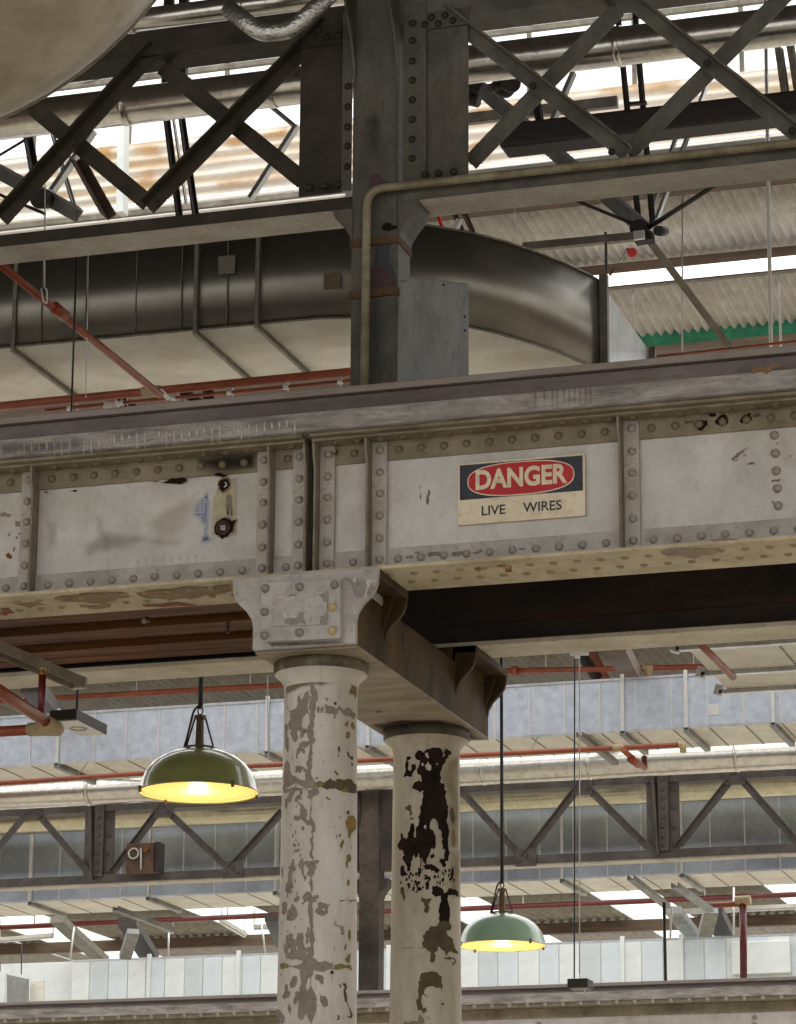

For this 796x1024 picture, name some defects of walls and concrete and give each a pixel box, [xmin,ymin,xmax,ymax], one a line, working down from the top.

peeling [685,411,761,431]
peeling [276,681,357,1024]
peeling [397,747,459,1024]